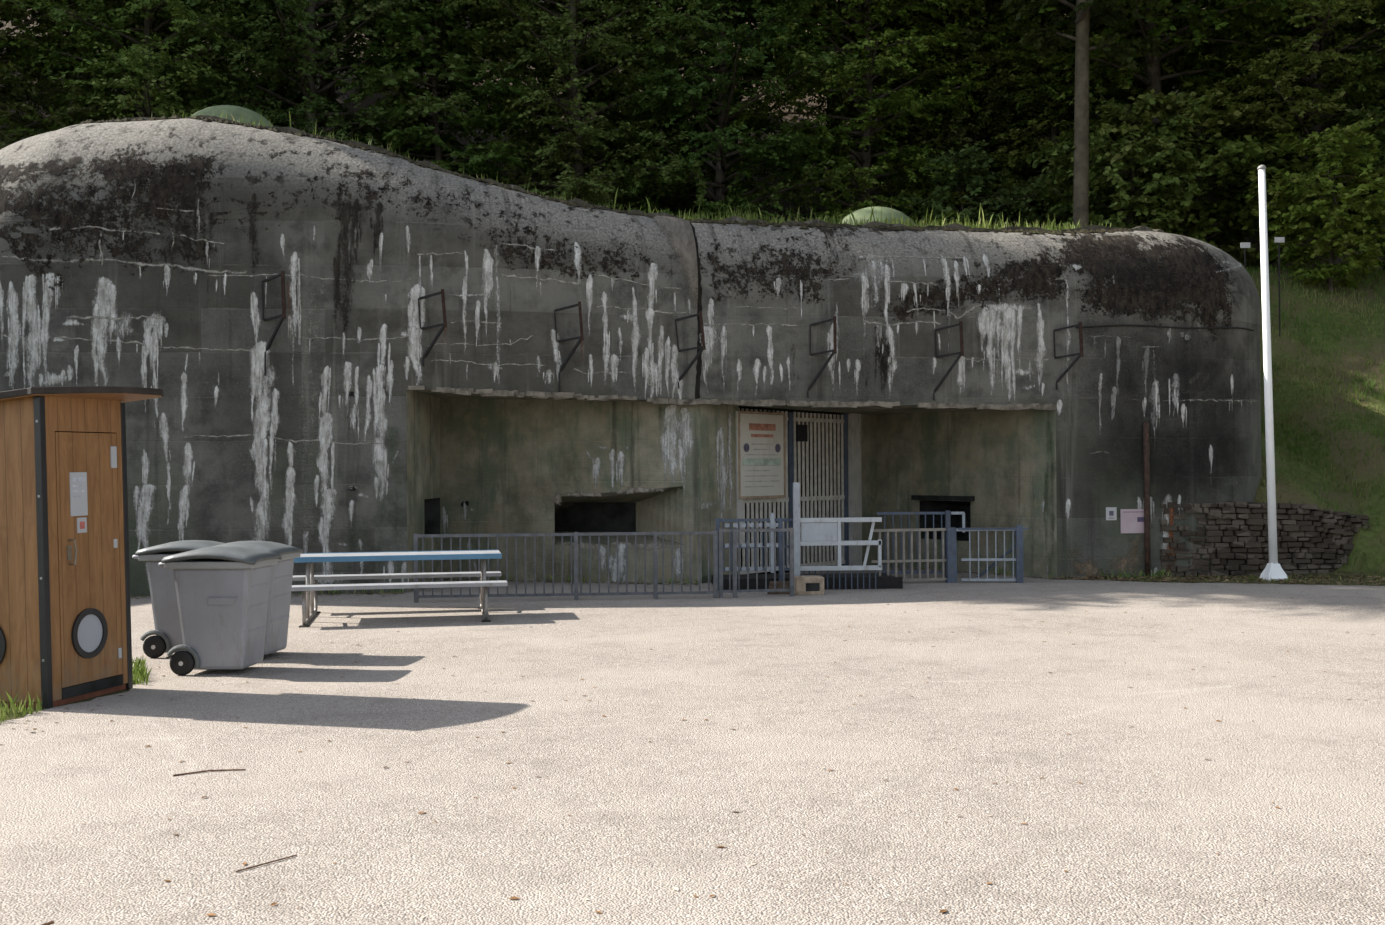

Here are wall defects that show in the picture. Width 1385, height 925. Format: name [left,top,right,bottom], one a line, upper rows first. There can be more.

damp [0,273,195,550]
damp [158,180,218,291]
damp [250,199,425,585]
damp [537,329,560,383]
damp [574,242,692,490]
damp [699,298,795,389]
damp [823,227,921,393]
damp [941,253,1071,415]